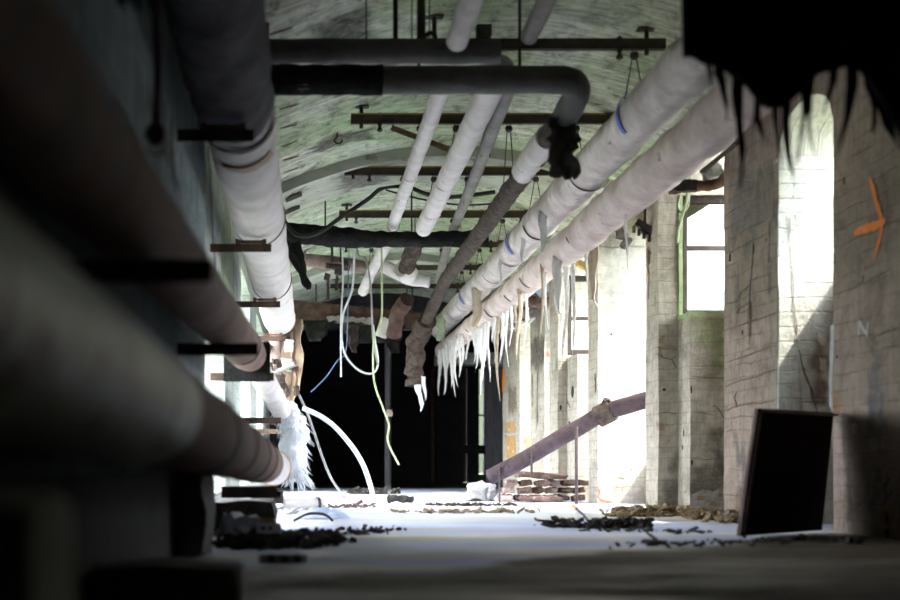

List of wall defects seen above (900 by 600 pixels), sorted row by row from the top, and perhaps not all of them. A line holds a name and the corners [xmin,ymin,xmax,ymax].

crack [657,220,825,419]